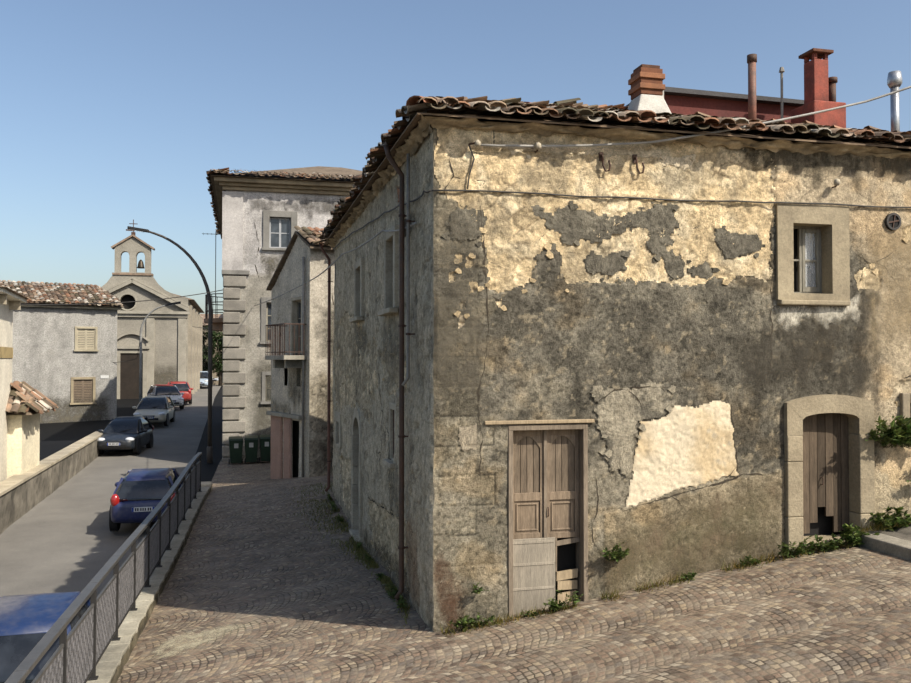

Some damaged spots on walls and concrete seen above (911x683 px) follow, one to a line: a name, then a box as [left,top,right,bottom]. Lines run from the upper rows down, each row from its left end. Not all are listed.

spalling [434,127,776,328]
spalling [854,263,882,291]
peeling [590,380,676,476]